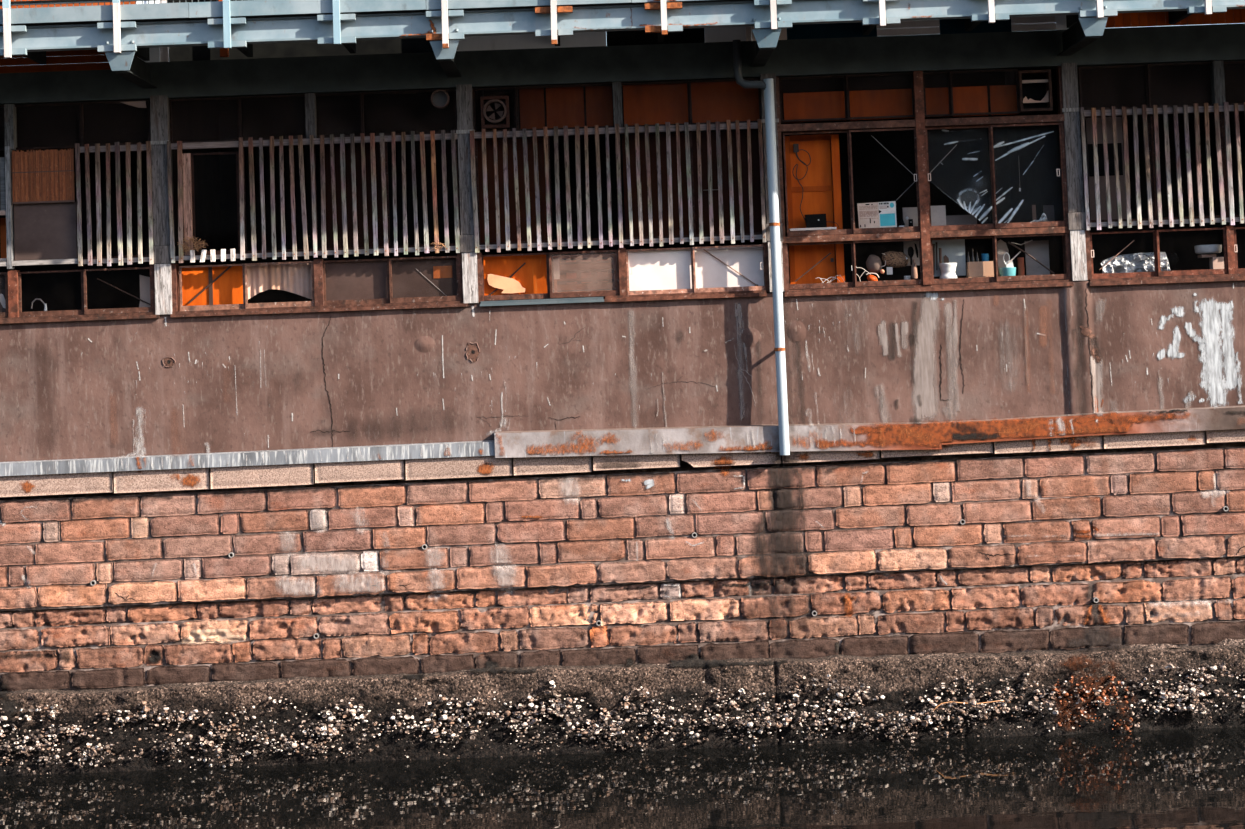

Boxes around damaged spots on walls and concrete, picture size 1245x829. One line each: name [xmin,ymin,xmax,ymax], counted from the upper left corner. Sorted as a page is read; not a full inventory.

water stain [1050,284,1100,436]
peeling [1157,293,1242,407]
water stain [59,494,172,502]
rust [173,454,200,487]
water stain [214,485,381,495]
rust [527,432,632,456]
rust [667,429,772,476]
rust [793,395,1190,460]
water stain [734,449,1095,631]